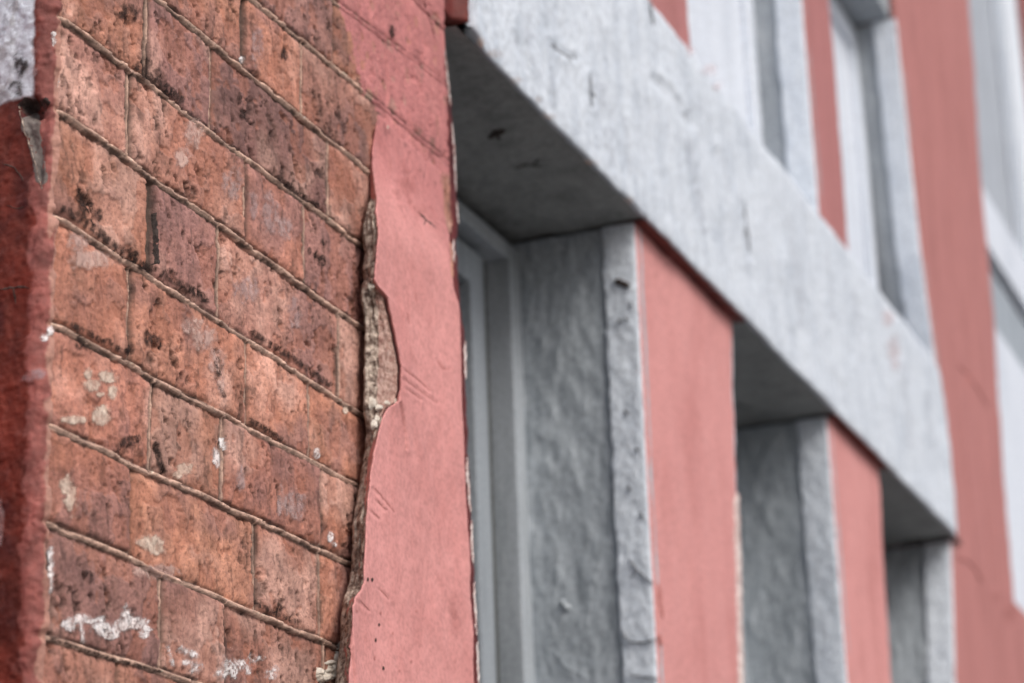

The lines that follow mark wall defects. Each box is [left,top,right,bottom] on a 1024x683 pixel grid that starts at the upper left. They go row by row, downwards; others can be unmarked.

peeling [61,416,86,424]
flaking render [335,177,398,683]
leakage [212,438,225,468]
leakage [61,606,150,643]
leakage [168,646,198,672]
leakage [216,657,260,678]